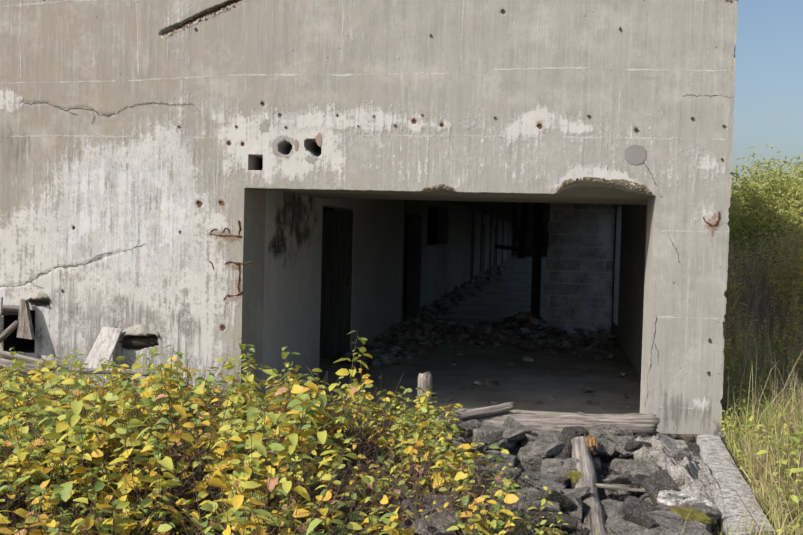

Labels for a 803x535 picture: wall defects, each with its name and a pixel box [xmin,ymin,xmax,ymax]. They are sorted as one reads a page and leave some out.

crack [23,102,193,124]
leakage [645,131,726,195]
spalling [550,164,653,194]
leakage [694,205,726,228]
leakage [0,80,663,408]
crack [0,245,142,288]
leakage [664,397,711,423]